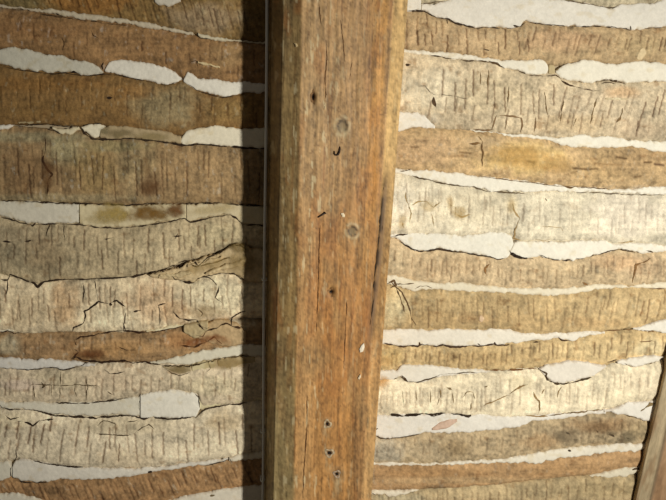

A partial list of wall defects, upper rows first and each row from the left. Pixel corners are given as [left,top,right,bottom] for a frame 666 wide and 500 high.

peeling [407,0,666,30]
peeling [0,46,265,97]
peeling [404,47,666,84]
peeling [52,124,268,148]
peeling [469,129,666,152]
peeling [395,168,666,196]
peeling [0,201,267,228]
peeling [391,231,666,261]
crack [0,243,247,436]
peeling [383,315,605,346]
peeling [376,399,656,439]
peeling [0,450,265,483]